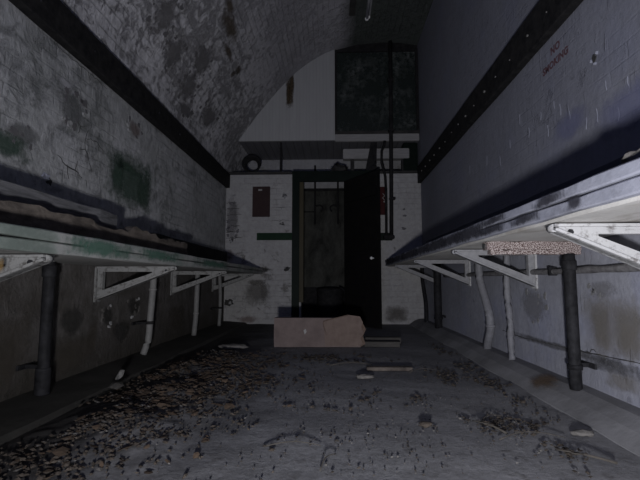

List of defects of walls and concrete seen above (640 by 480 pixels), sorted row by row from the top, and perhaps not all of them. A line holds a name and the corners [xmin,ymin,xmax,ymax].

water stain [0,132,24,157]
water stain [110,152,151,206]
water stain [526,336,568,352]